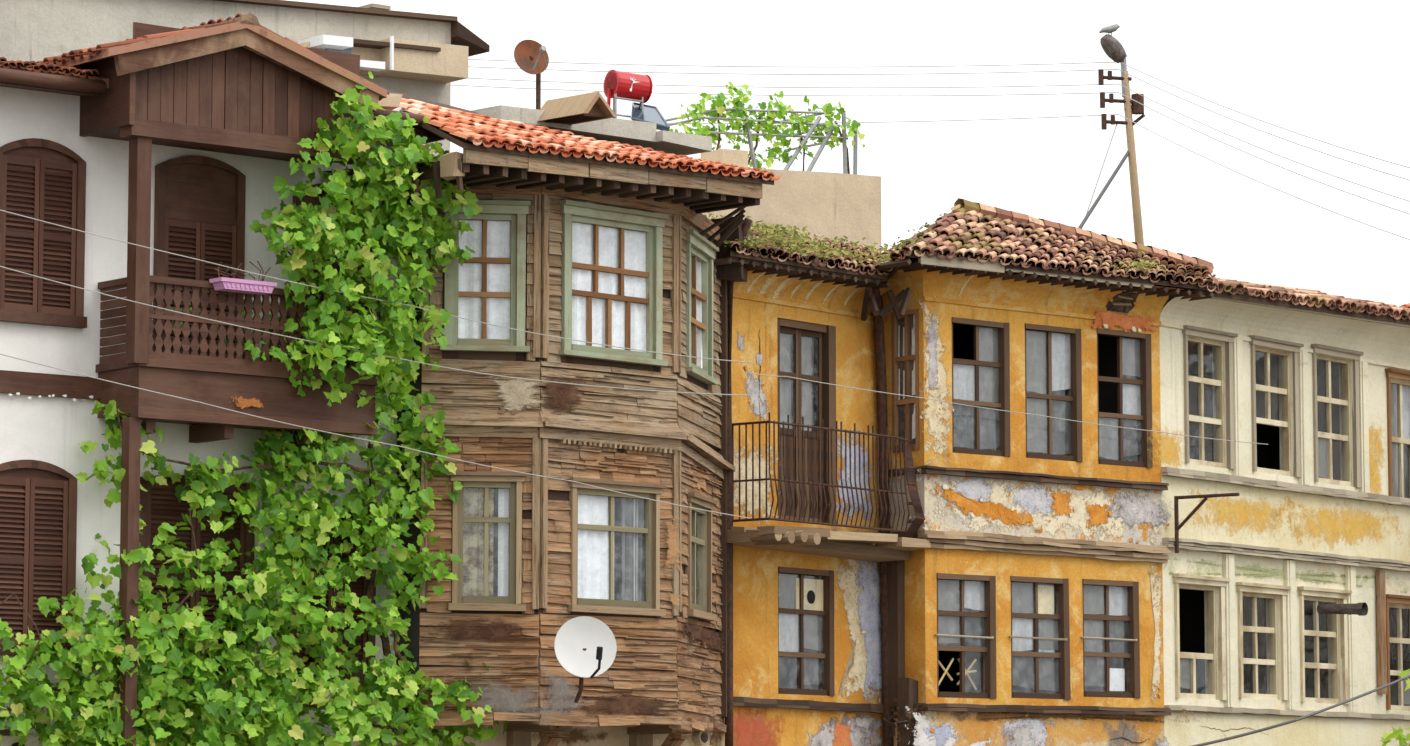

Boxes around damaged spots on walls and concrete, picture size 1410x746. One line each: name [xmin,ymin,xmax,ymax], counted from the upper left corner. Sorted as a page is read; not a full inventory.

peeling [737,331,771,420]
peeling [899,290,1183,546]
peeling [833,430,877,533]
water stain [1195,493,1398,547]
peeling [797,558,883,746]
peeling [1148,565,1163,707]
peeling [905,706,1056,746]